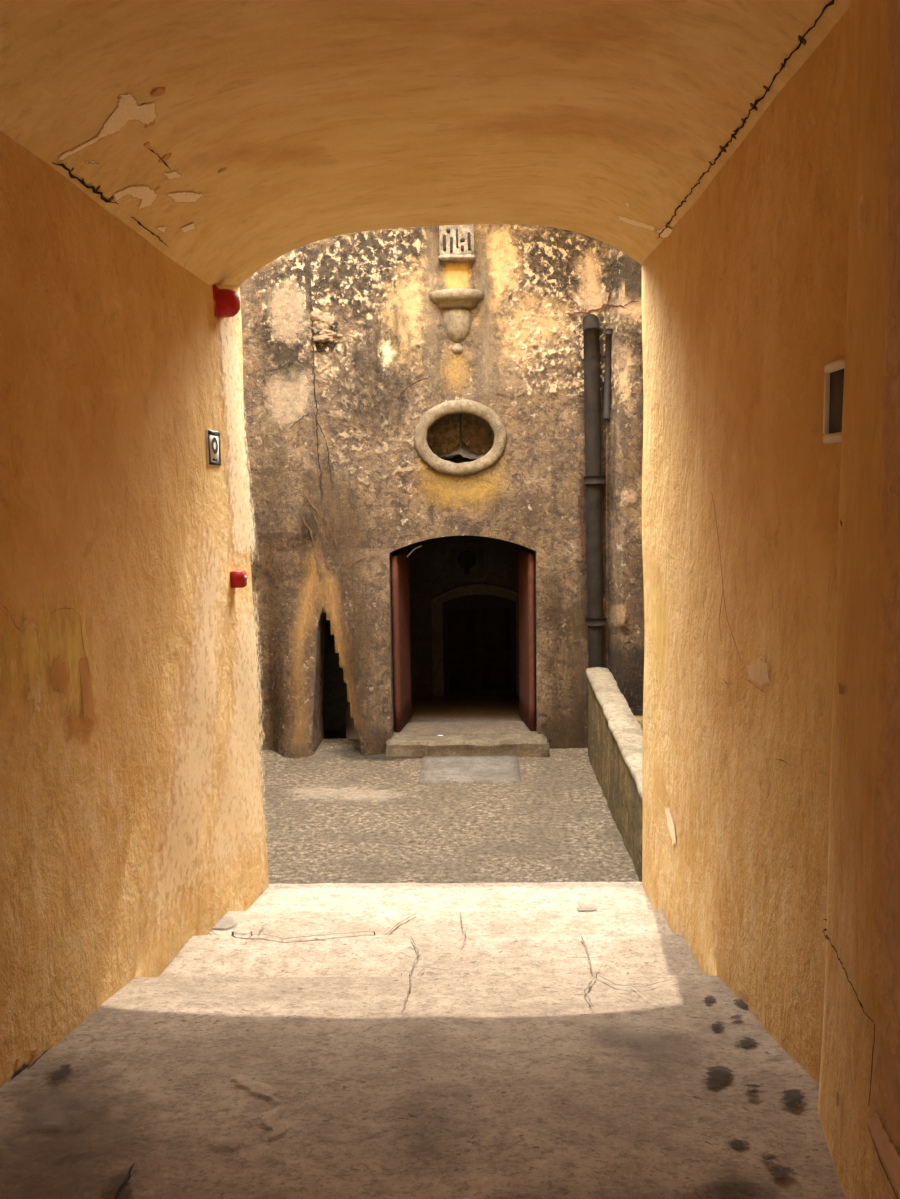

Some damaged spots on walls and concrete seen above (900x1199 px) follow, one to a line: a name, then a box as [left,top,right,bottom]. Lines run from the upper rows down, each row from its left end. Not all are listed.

peeling [58,87,166,165]
peeling [114,152,203,209]
crack [657,0,834,239]
water stain [257,226,440,759]
water stain [475,226,644,749]
crack [105,1163,134,1199]